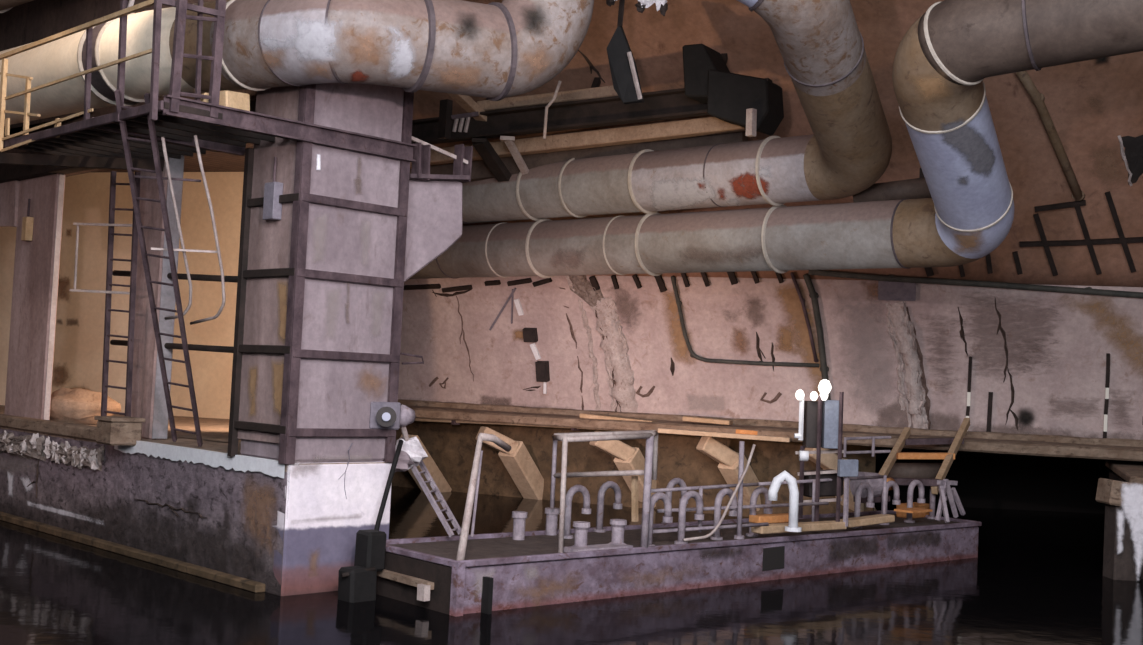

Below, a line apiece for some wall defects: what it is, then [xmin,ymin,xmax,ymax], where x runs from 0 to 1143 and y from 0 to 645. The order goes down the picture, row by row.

spalling [1118,135,1143,186]
crack [432,289,474,381]
crack [561,288,584,410]
crack [958,308,968,356]
crack [995,298,1018,430]
spalling [0,430,105,471]
crack [136,499,208,518]